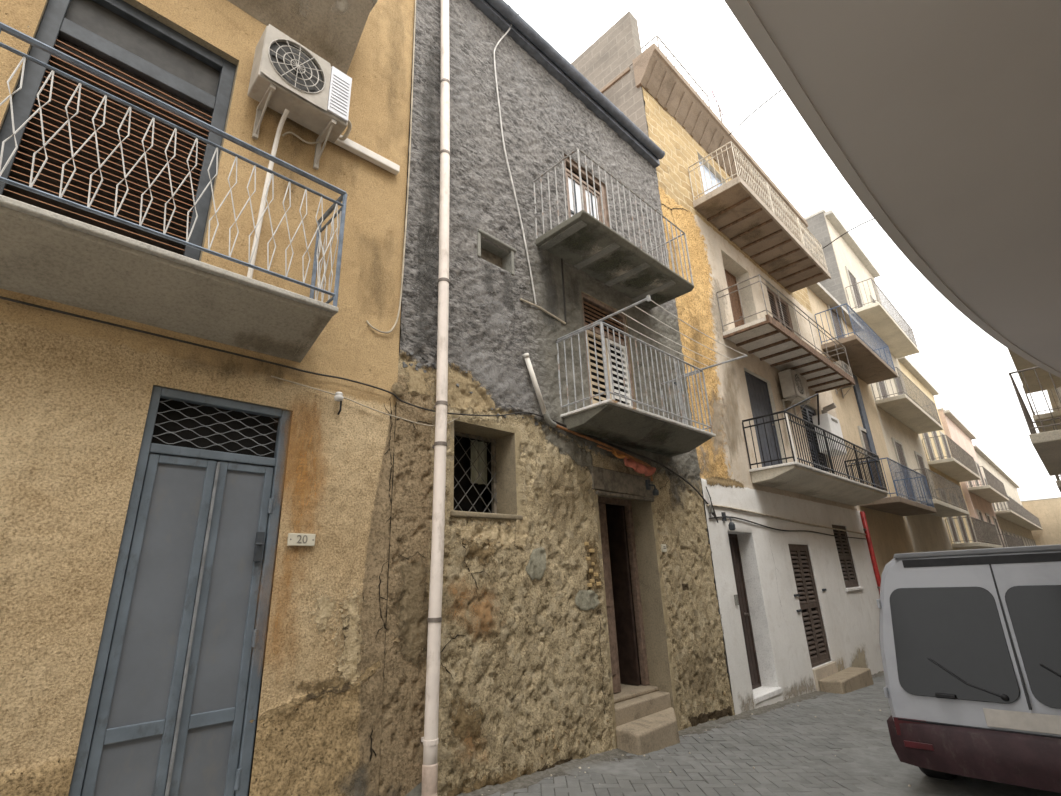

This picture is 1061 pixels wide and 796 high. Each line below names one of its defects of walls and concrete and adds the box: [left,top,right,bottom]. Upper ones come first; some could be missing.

peeling [713,281,727,337]
peeling [403,352,593,473]
peeling [700,399,744,489]
spalling [455,516,529,566]
spalling [584,540,604,590]
crack [369,725,377,761]
spalling [448,698,486,753]
spalling [444,720,580,796]
spalling [689,693,733,727]